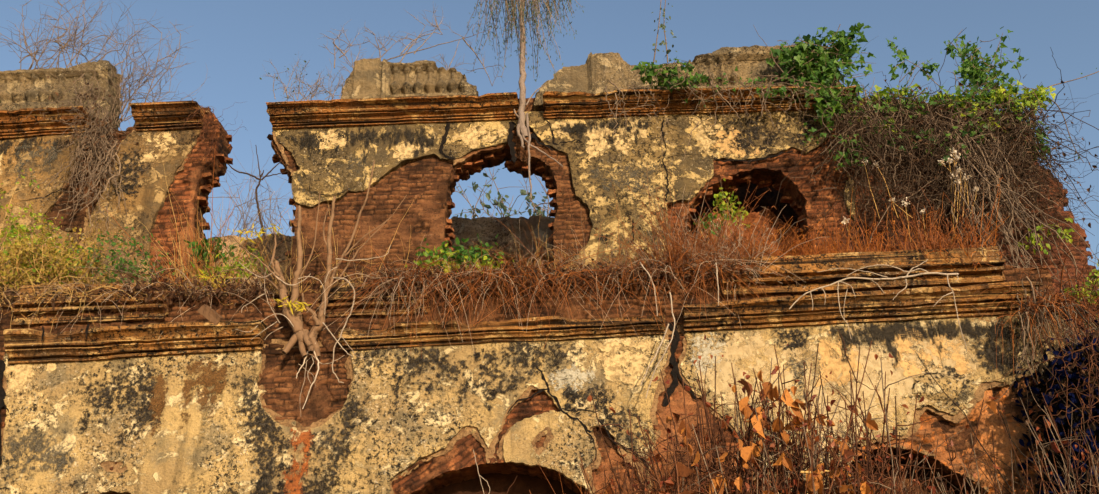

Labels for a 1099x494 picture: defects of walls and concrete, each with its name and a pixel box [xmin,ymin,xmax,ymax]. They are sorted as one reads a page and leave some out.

flaking render [44,121,176,284]
water stain [289,124,437,162]
flaking render [291,117,648,294]
flaking render [667,116,857,255]
crack [0,360,9,466]
flaking render [257,339,354,432]
water stain [227,336,655,494]
crack [507,367,649,482]
crack [662,322,698,406]
flaking render [390,323,1080,494]
water stain [771,327,809,407]
water stain [830,318,1026,379]